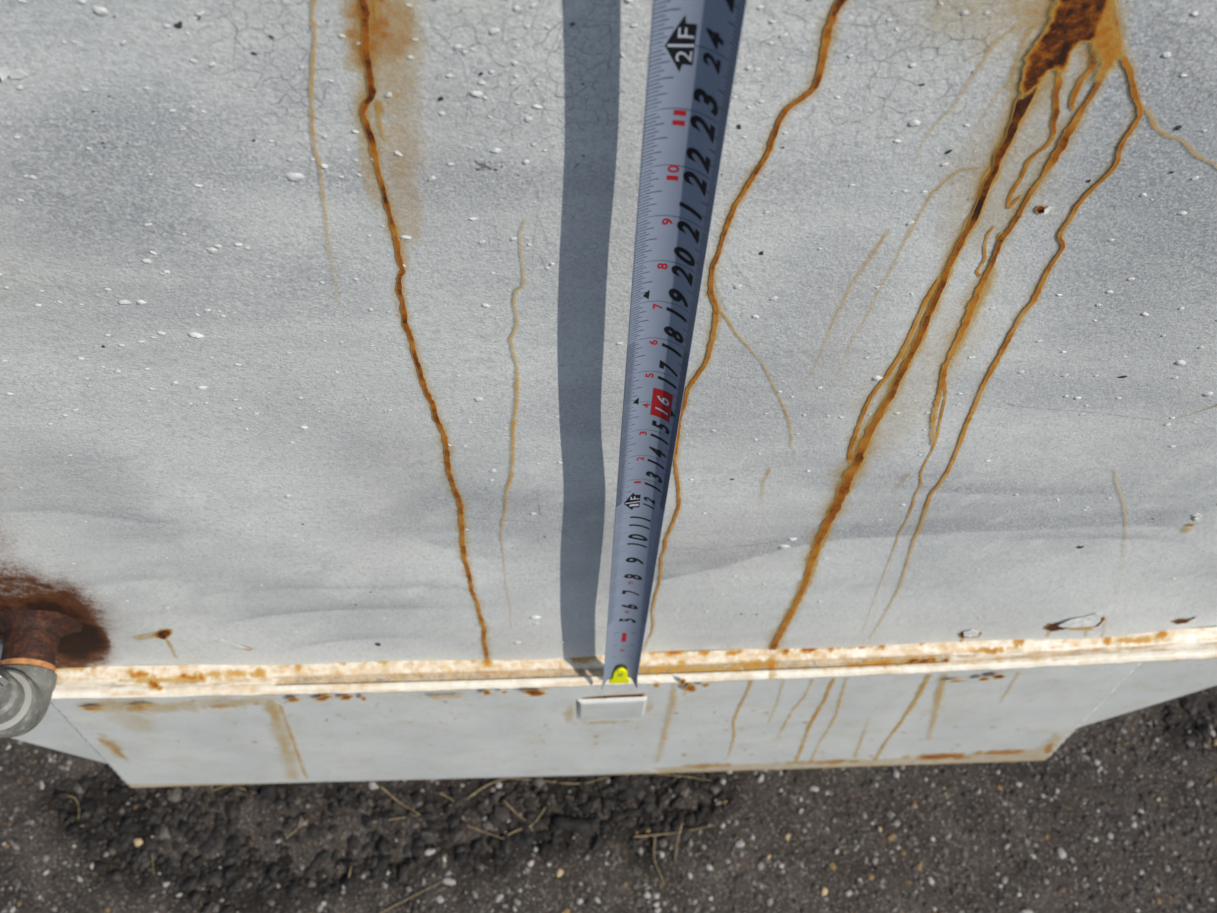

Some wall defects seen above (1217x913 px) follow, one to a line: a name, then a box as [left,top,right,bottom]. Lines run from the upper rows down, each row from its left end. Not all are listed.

corrosion [343,0,493,667]
corrosion [501,233,525,563]
corrosion [639,0,1217,771]
corrosion [0,563,111,671]
peeling [1044,613,1105,636]
corrosion [120,668,266,691]
corrosion [315,695,377,707]